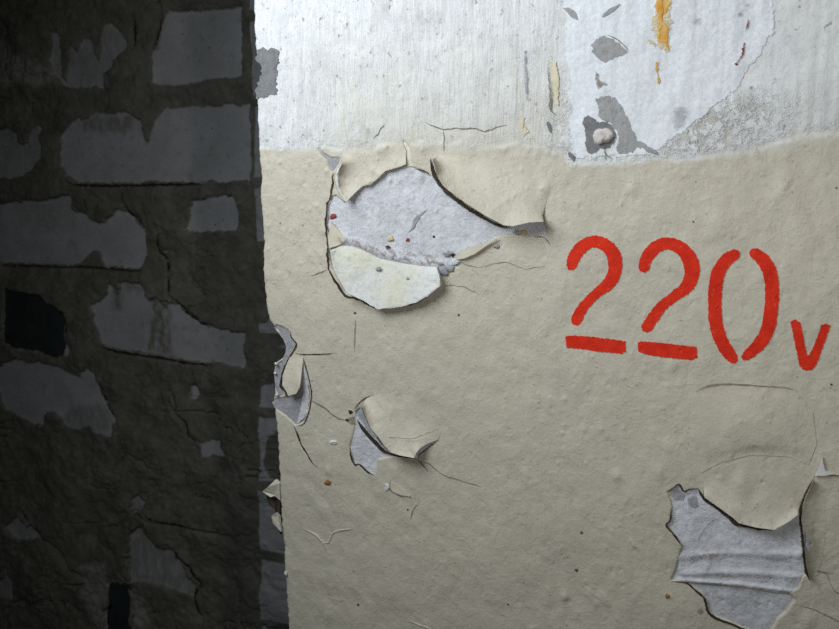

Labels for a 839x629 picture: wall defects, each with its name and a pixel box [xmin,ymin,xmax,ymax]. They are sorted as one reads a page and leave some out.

spalling [591,35,627,62]
spalling [582,73,657,159]
rust [647,0,673,52]
peeling [310,123,550,310]
peeling [272,325,478,486]
peeling [665,457,839,629]